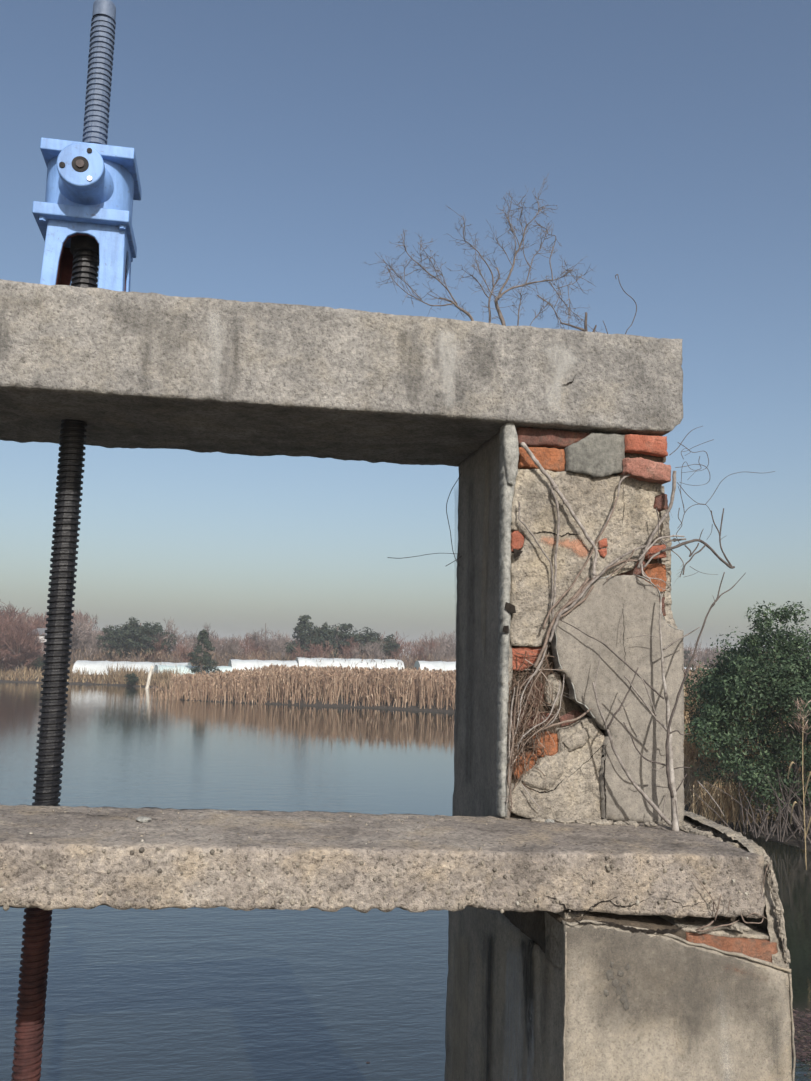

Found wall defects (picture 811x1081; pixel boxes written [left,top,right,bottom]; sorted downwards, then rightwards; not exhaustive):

flaking render [516,427,590,472]
flaking render [616,434,671,512]
flaking render [511,530,524,558]
flaking render [598,538,608,558]
flaking render [598,545,684,631]
flaking render [510,647,595,790]
crack [523,745,606,811]
flaking render [0,808,791,973]